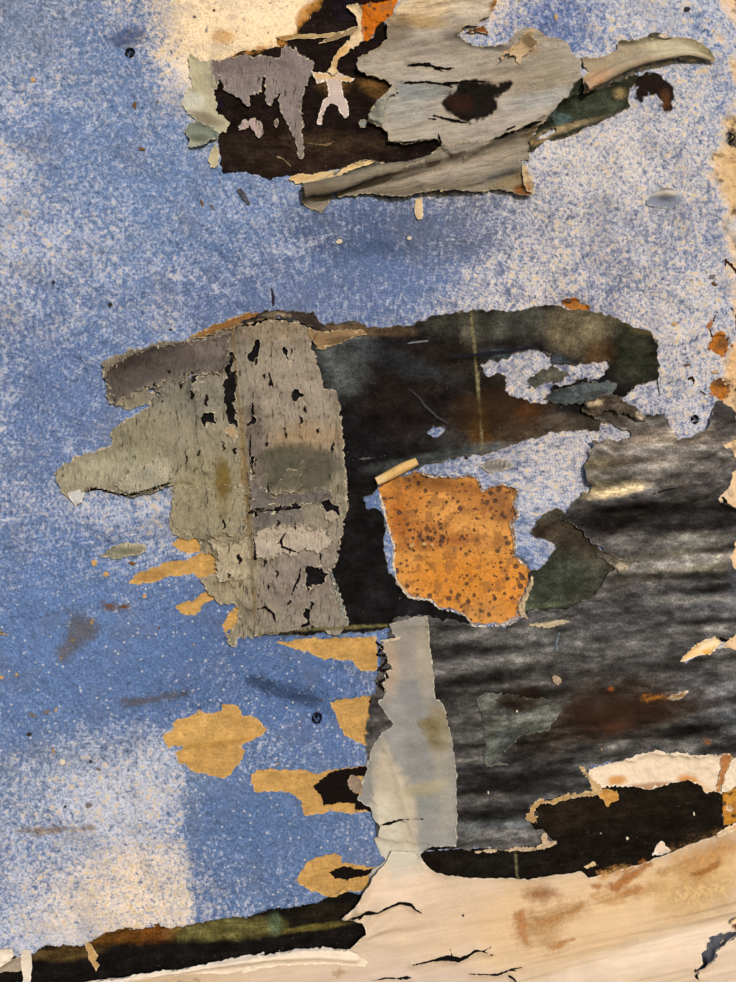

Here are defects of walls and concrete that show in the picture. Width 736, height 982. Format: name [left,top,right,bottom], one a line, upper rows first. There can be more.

flaking render [361,0,398,41]
flaking render [561,297,590,310]
flaking render [707,319,734,357]
flaking render [709,378,731,401]
flaking render [378,471,530,627]
peeling [680,636,722,662]
peeling [667,690,688,701]
peeling [348,775,363,794]
peeling [588,750,736,825]
peeling [652,841,671,855]